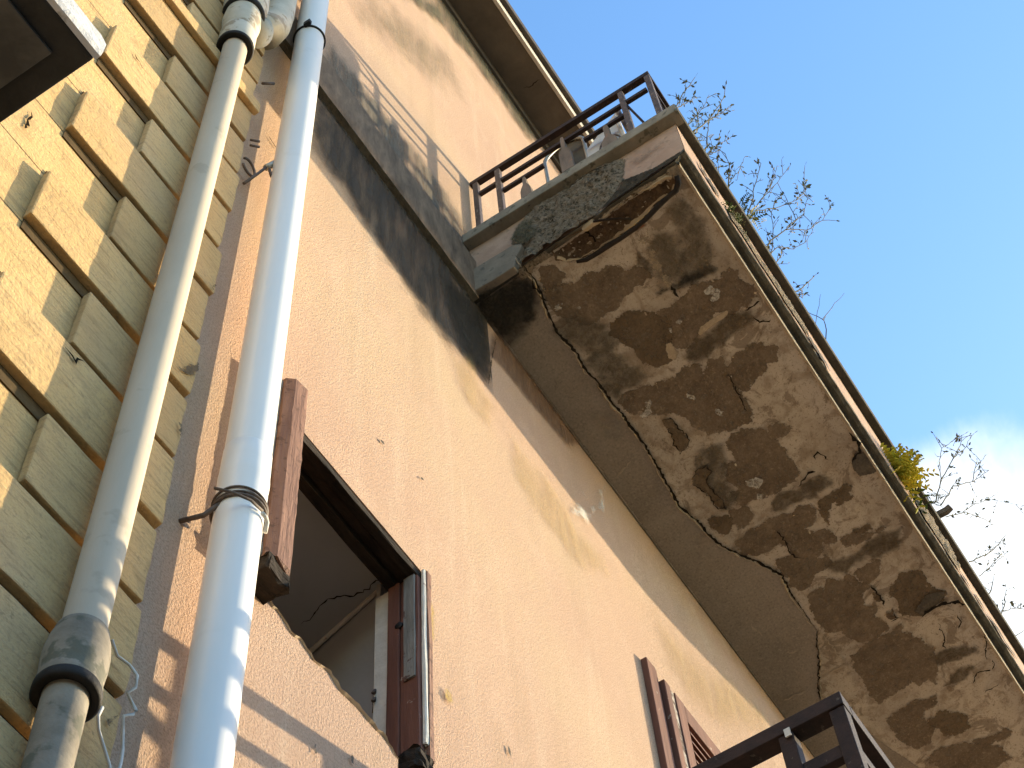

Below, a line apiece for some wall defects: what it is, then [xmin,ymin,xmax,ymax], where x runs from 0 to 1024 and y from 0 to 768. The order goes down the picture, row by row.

crack [302,580,378,623]
water stain [315,99,539,379]
crack [515,256,855,701]
flaking render [480,149,1017,768]